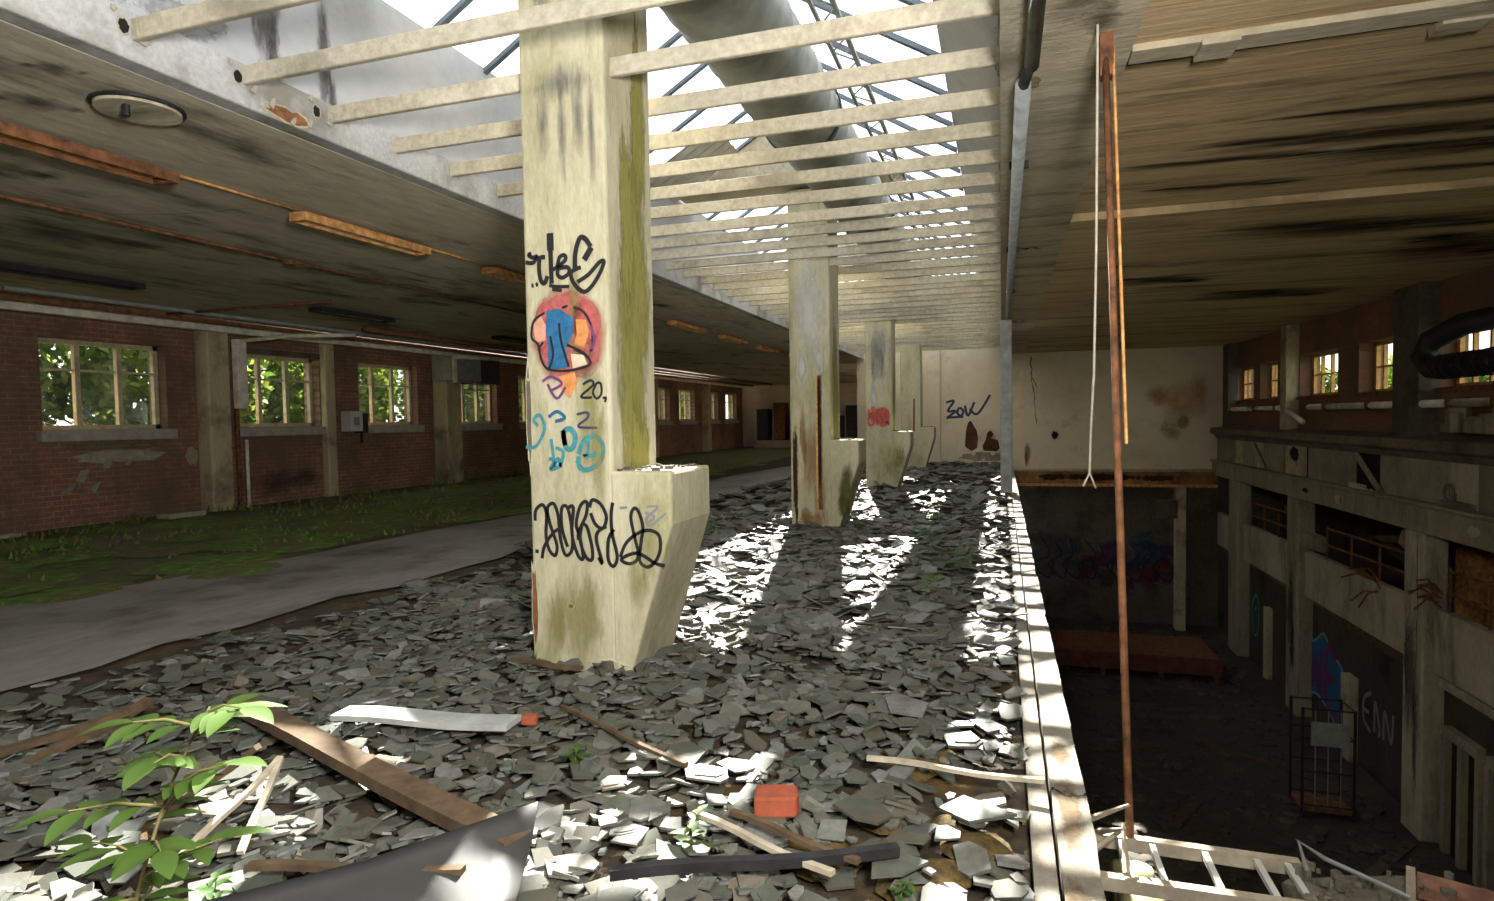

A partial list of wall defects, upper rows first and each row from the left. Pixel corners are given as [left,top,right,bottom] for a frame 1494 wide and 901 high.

water stain [257,11,278,60]
water stain [319,14,328,50]
water stain [322,70,336,105]
water stain [1132,95,1494,172]
water stain [619,74,645,334]
water stain [1147,179,1300,192]
water stain [1237,212,1494,257]
water stain [1123,275,1326,299]
water stain [631,405,649,468]